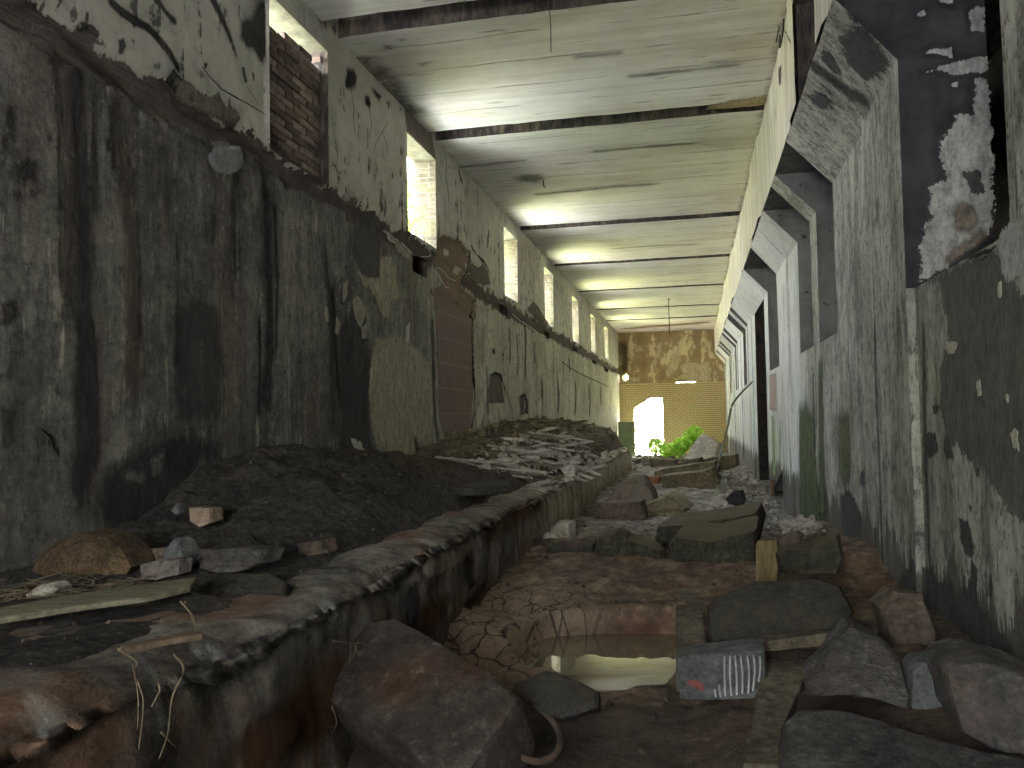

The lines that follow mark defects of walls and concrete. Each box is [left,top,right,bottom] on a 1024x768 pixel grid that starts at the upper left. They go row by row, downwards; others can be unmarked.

water stain [108,0,182,92]
spalling [173,77,240,130]
spalling [405,109,436,157]
peeling [968,5,985,33]
water stain [46,52,223,529]
water stain [258,168,278,447]
water stain [324,250,376,453]
peeling [343,230,542,455]
water stain [813,360,826,516]
water stain [922,324,930,558]
peeling [918,47,1024,525]
peeling [899,505,1018,658]